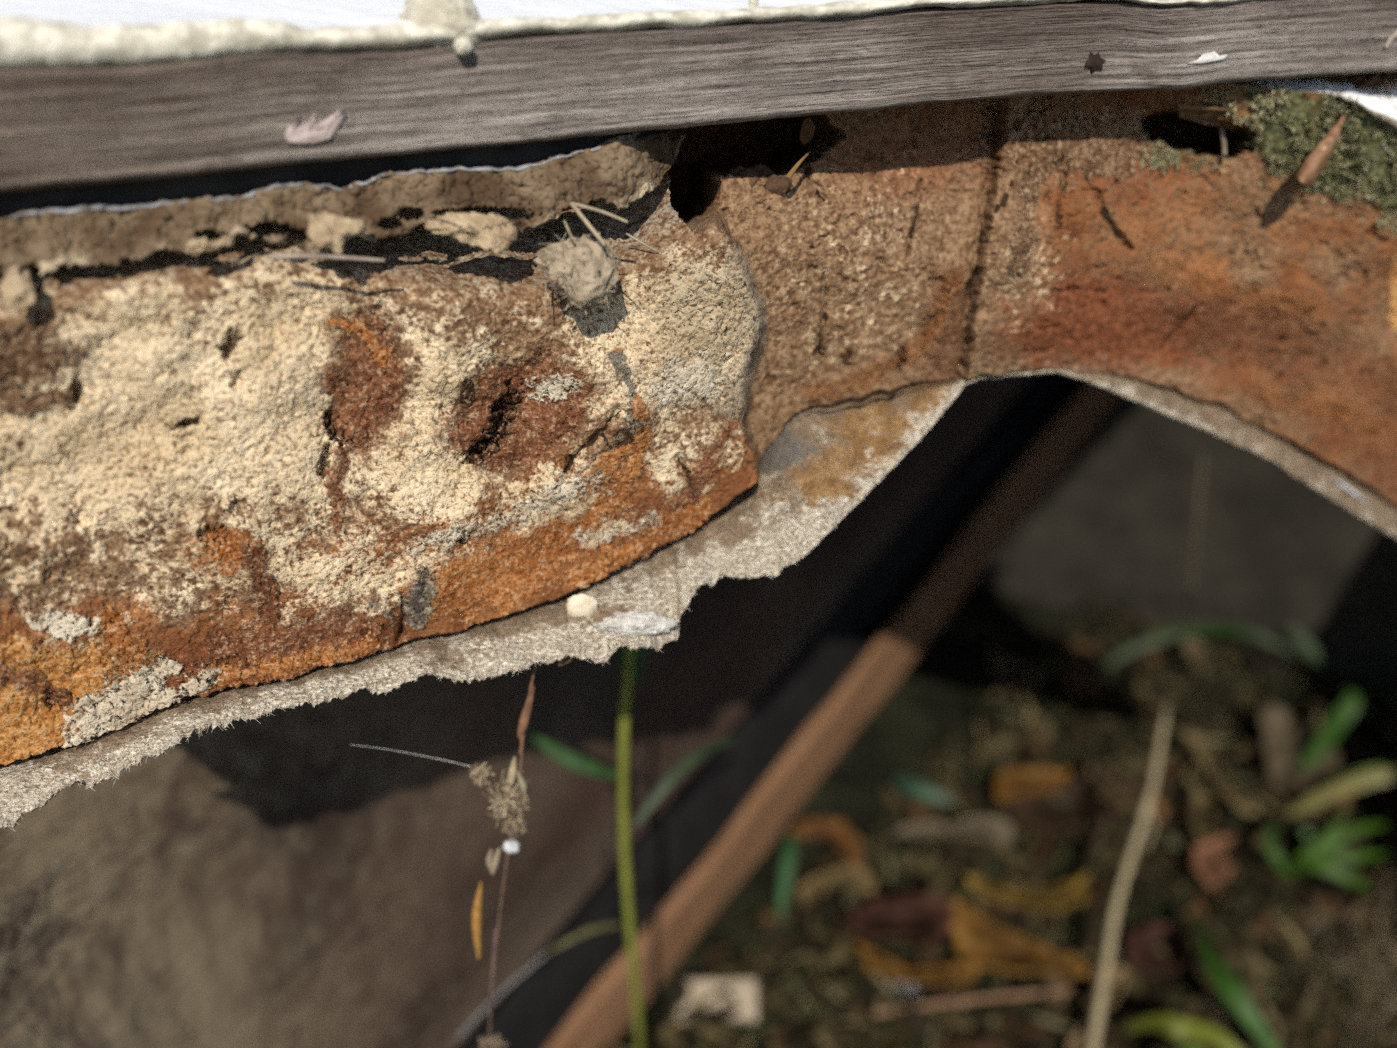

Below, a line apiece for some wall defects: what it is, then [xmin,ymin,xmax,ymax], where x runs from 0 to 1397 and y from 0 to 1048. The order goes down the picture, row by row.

peeling [0,128,686,311]
spalling [324,411,336,440]
rust [307,291,425,532]
spalling [432,344,628,483]
rust [171,392,744,695]
rust [0,605,169,766]